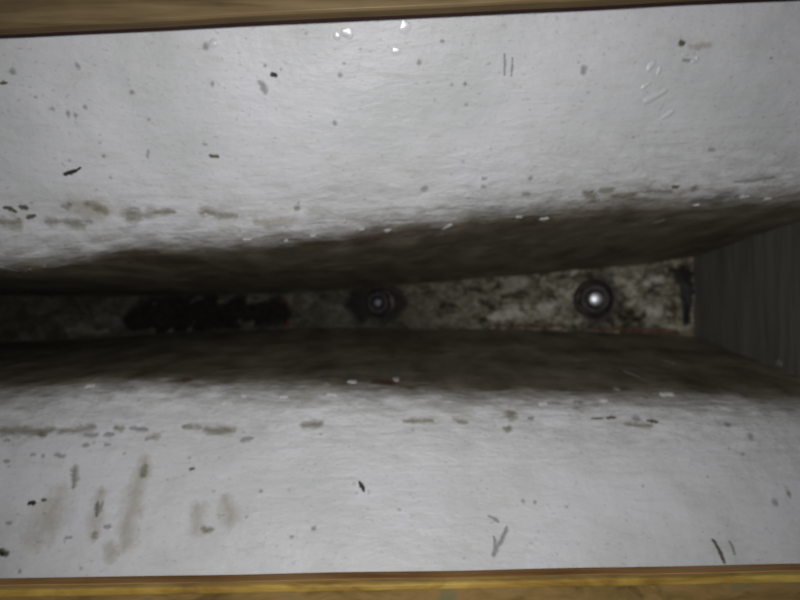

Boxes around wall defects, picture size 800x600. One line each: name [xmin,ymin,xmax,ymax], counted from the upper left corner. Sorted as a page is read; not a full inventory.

leakage [0,205,36,224]
leakage [643,275,666,289]